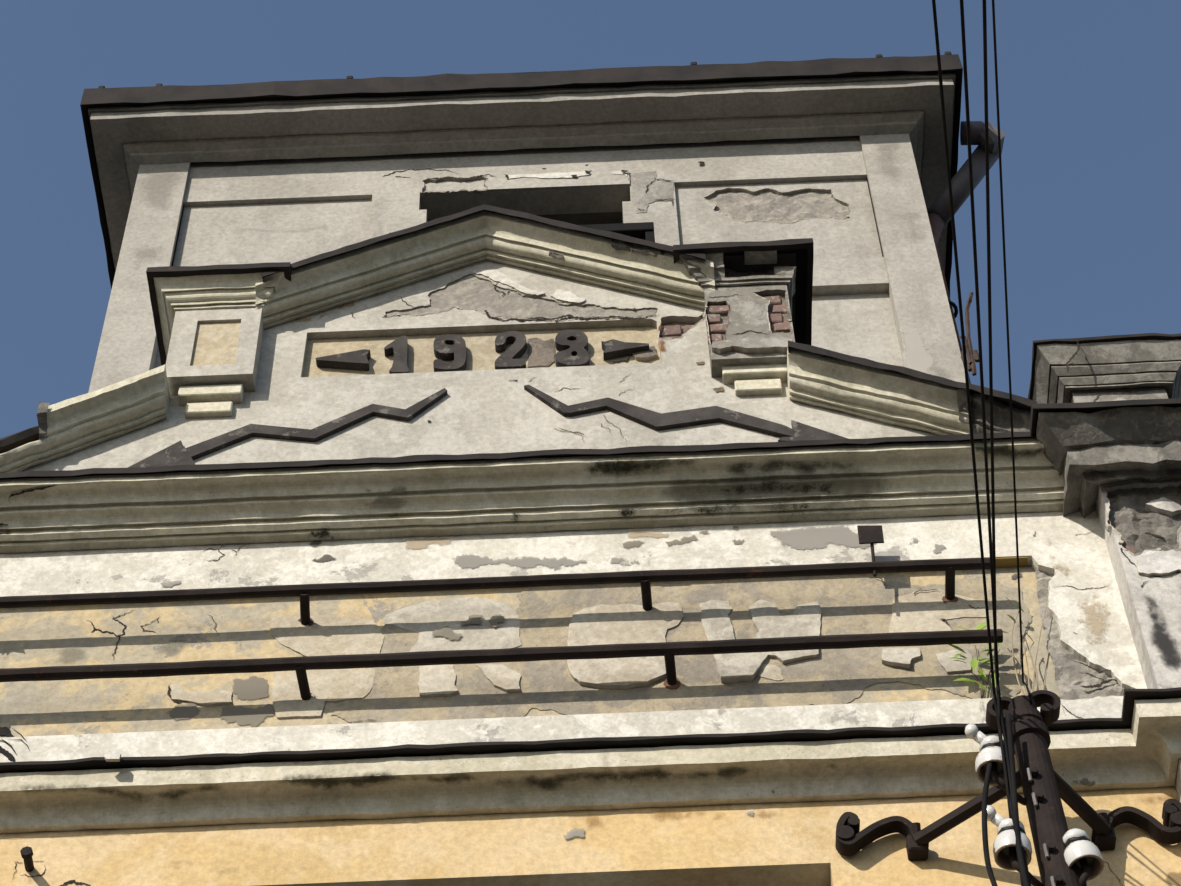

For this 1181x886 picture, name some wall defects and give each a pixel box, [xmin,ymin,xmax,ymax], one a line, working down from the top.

peeling [382,269,793,368]
leakage [590,459,689,475]
mould [698,462,851,520]
mould [961,441,1045,458]
peeling [452,554,586,570]
peeling [610,530,707,565]
peeling [770,525,870,550]
spalling [1103,480,1181,577]
crack [87,610,159,660]
peeling [169,566,1127,728]
leakage [1148,598,1181,667]
crack [13,860,91,886]